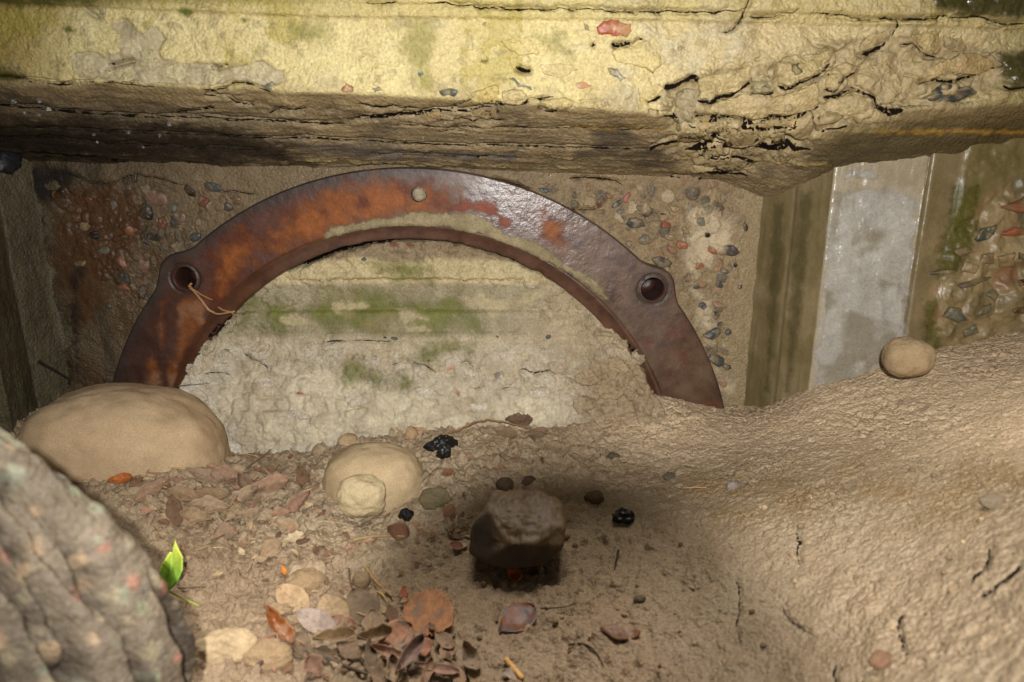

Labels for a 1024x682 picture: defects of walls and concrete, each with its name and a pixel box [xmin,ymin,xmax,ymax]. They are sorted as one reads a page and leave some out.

peeling [69,5,286,90]
crack [0,59,669,188]
flaking render [439,88,458,96]
peeling [470,36,609,119]
spalling [584,19,1024,180]
corrosion [268,181,512,253]
corrosion [543,221,565,246]
corrosion [147,230,252,388]
damp [211,307,581,453]